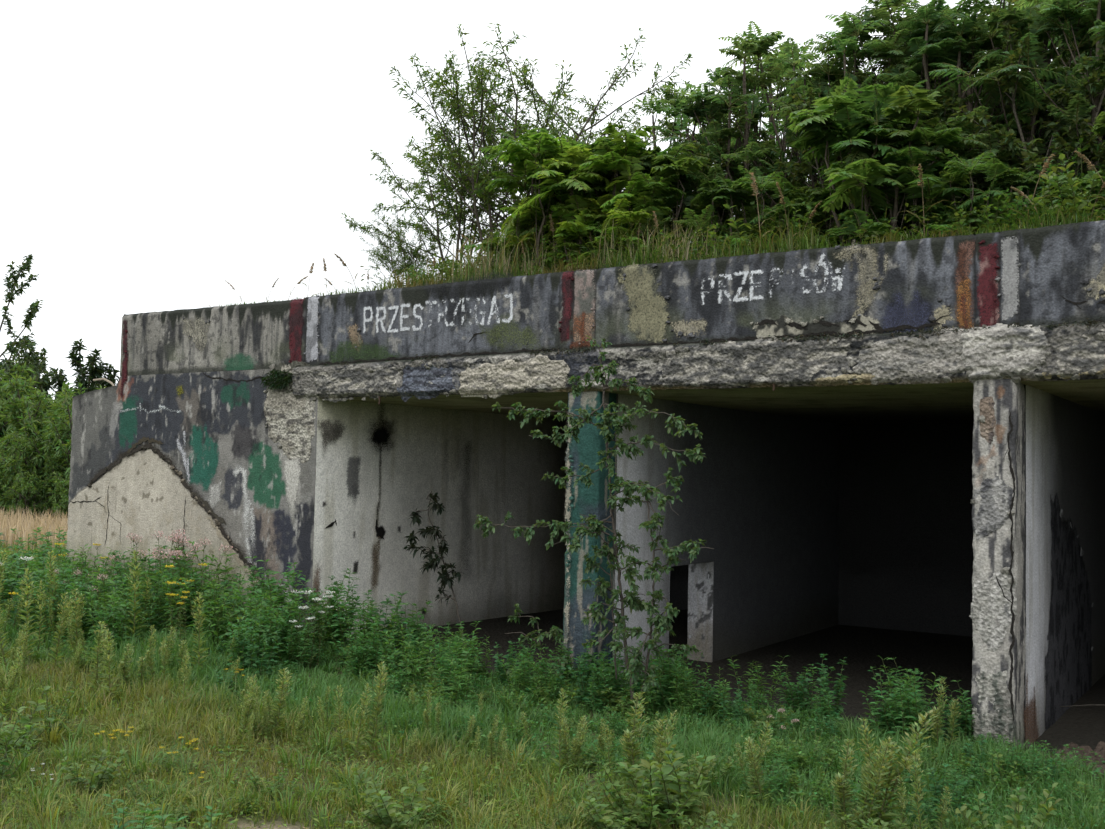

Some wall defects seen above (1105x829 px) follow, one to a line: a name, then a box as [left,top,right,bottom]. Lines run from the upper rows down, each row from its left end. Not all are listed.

peeling [558,269,596,345]
spalling [617,236,1105,388]
spalling [263,295,571,540]
spalling [970,475,1015,542]
crack [996,410,1015,721]
spalling [969,567,1017,652]
spalling [972,670,1015,744]